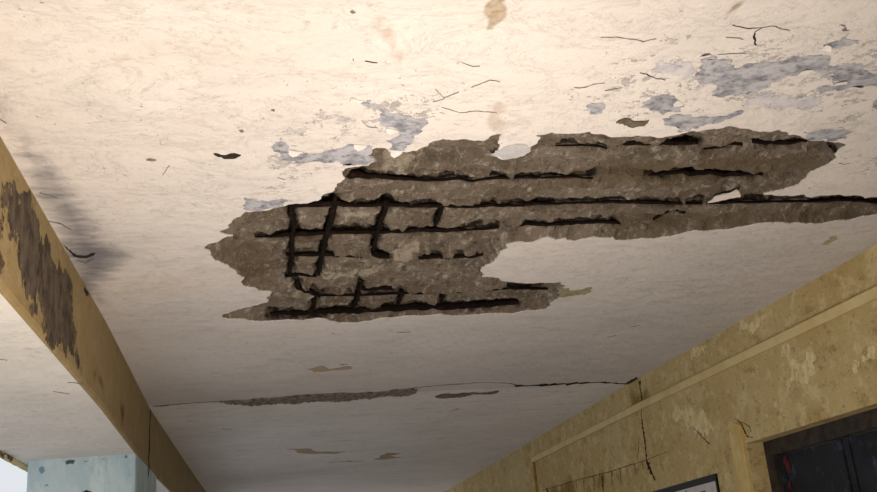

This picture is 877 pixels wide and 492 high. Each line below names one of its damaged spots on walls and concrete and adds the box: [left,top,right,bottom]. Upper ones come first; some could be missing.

damp [485,0,505,29]
spalling [205,25,877,322]
damp [64,243,107,269]
crack [148,401,219,477]
crack [415,377,666,490]